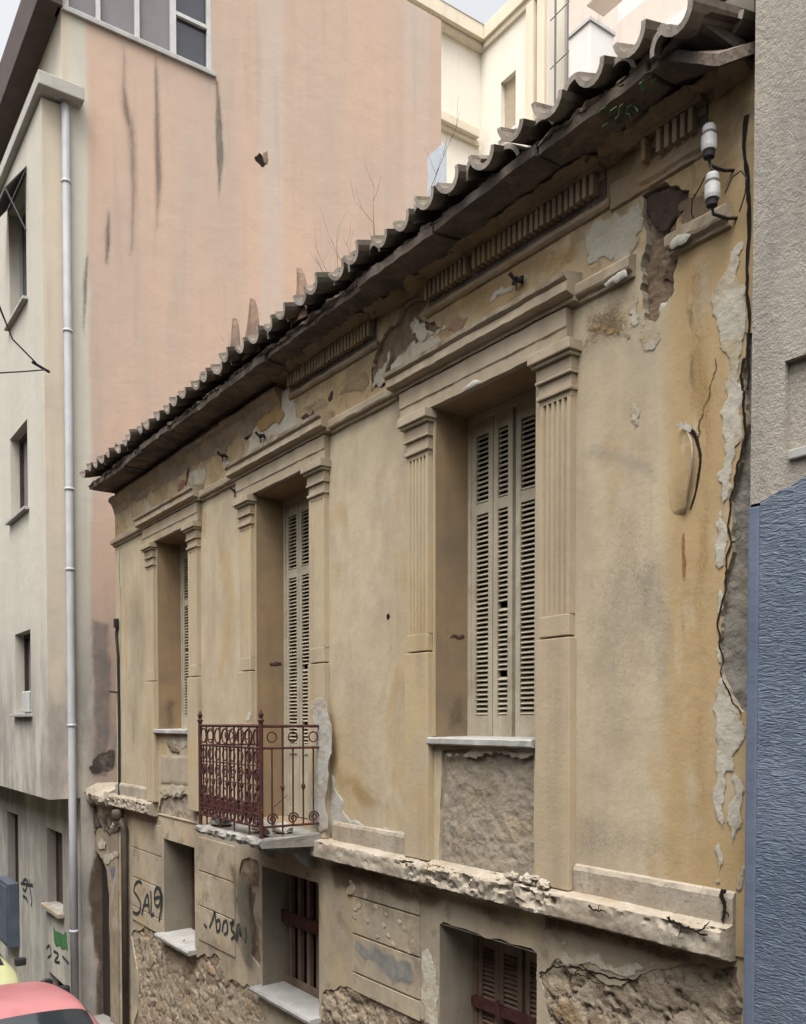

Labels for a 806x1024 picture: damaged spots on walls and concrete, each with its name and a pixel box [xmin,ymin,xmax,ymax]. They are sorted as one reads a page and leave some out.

damp [119,44,139,262]
damp [151,58,164,232]
damp [214,81,226,193]
flaking render [585,186,717,338]
flaking render [246,300,468,452]
crack [697,114,751,713]
peeling [710,242,752,883]
damp [87,575,147,778]
peeling [310,697,368,836]
flaking render [238,858,261,965]
crack [539,963,600,984]
crack [666,889,729,940]